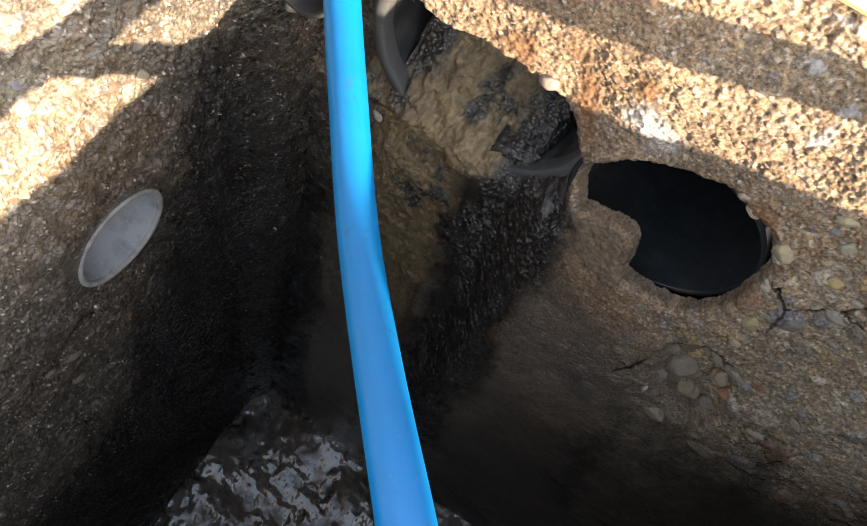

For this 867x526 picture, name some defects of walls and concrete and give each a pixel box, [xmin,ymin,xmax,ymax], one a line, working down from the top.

water stain [49,10,329,526]
water stain [372,132,574,445]
crack [767,281,867,332]